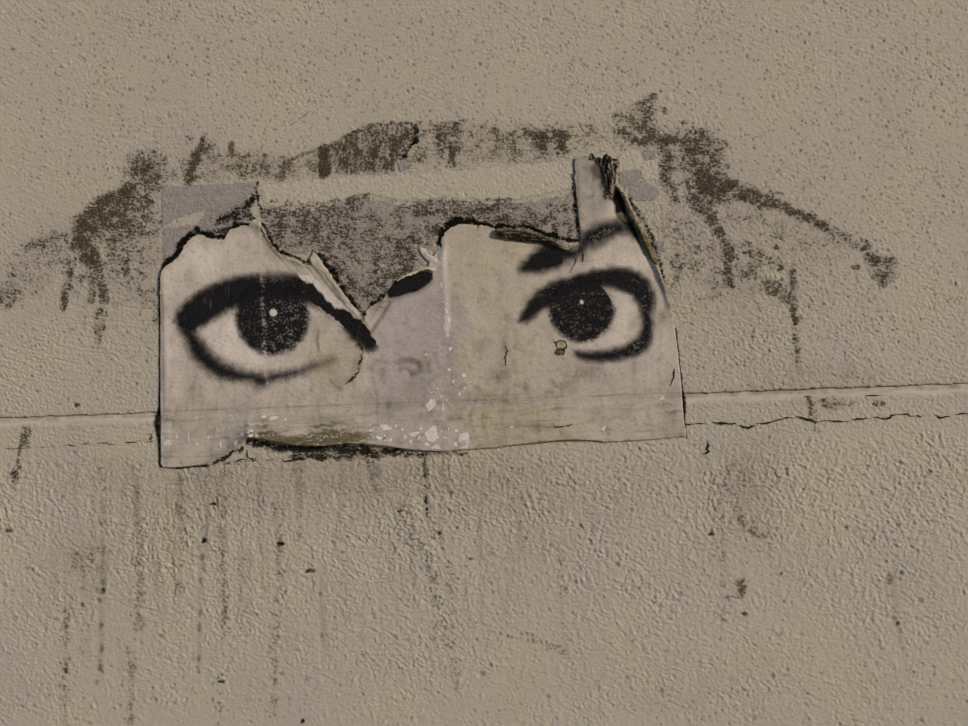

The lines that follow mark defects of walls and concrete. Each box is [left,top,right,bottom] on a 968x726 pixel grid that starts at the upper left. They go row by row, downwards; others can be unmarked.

peeling [618,150,661,230]
peeling [161,161,581,311]
crack [686,395,968,455]